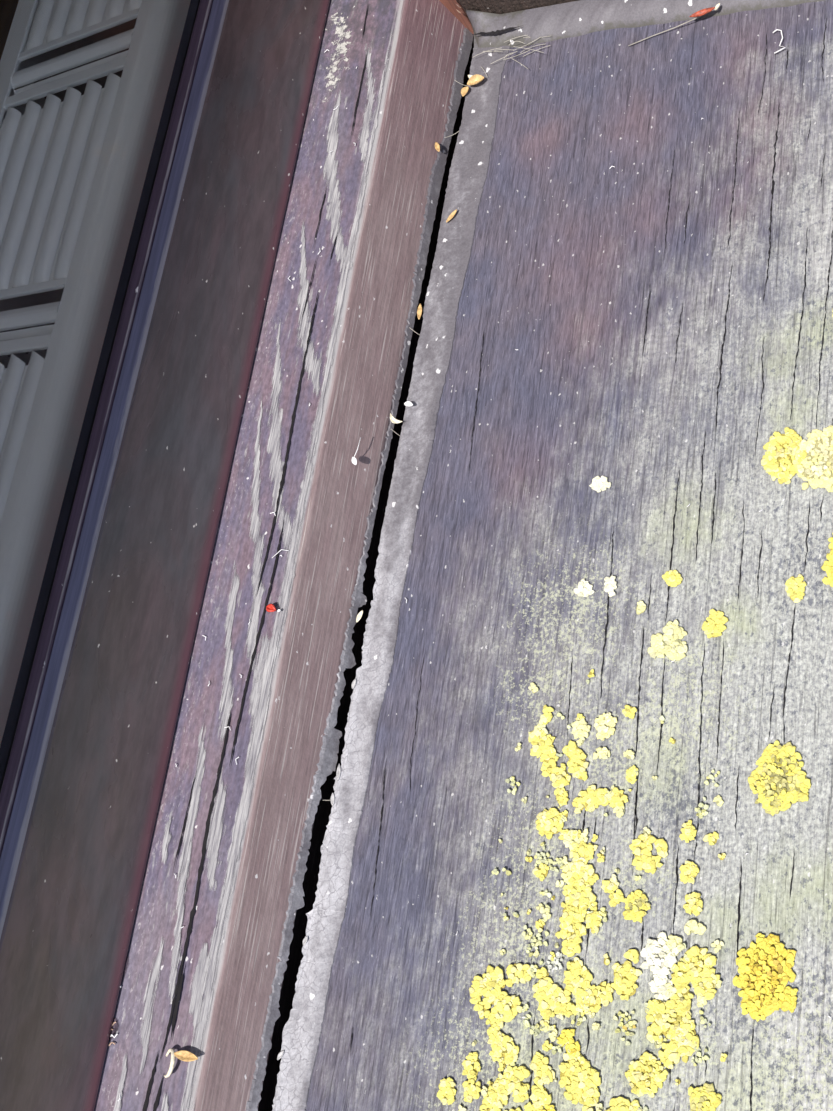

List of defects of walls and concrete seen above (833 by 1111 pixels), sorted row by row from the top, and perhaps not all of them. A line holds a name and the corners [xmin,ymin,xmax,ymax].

crack [142,184,339,1111]